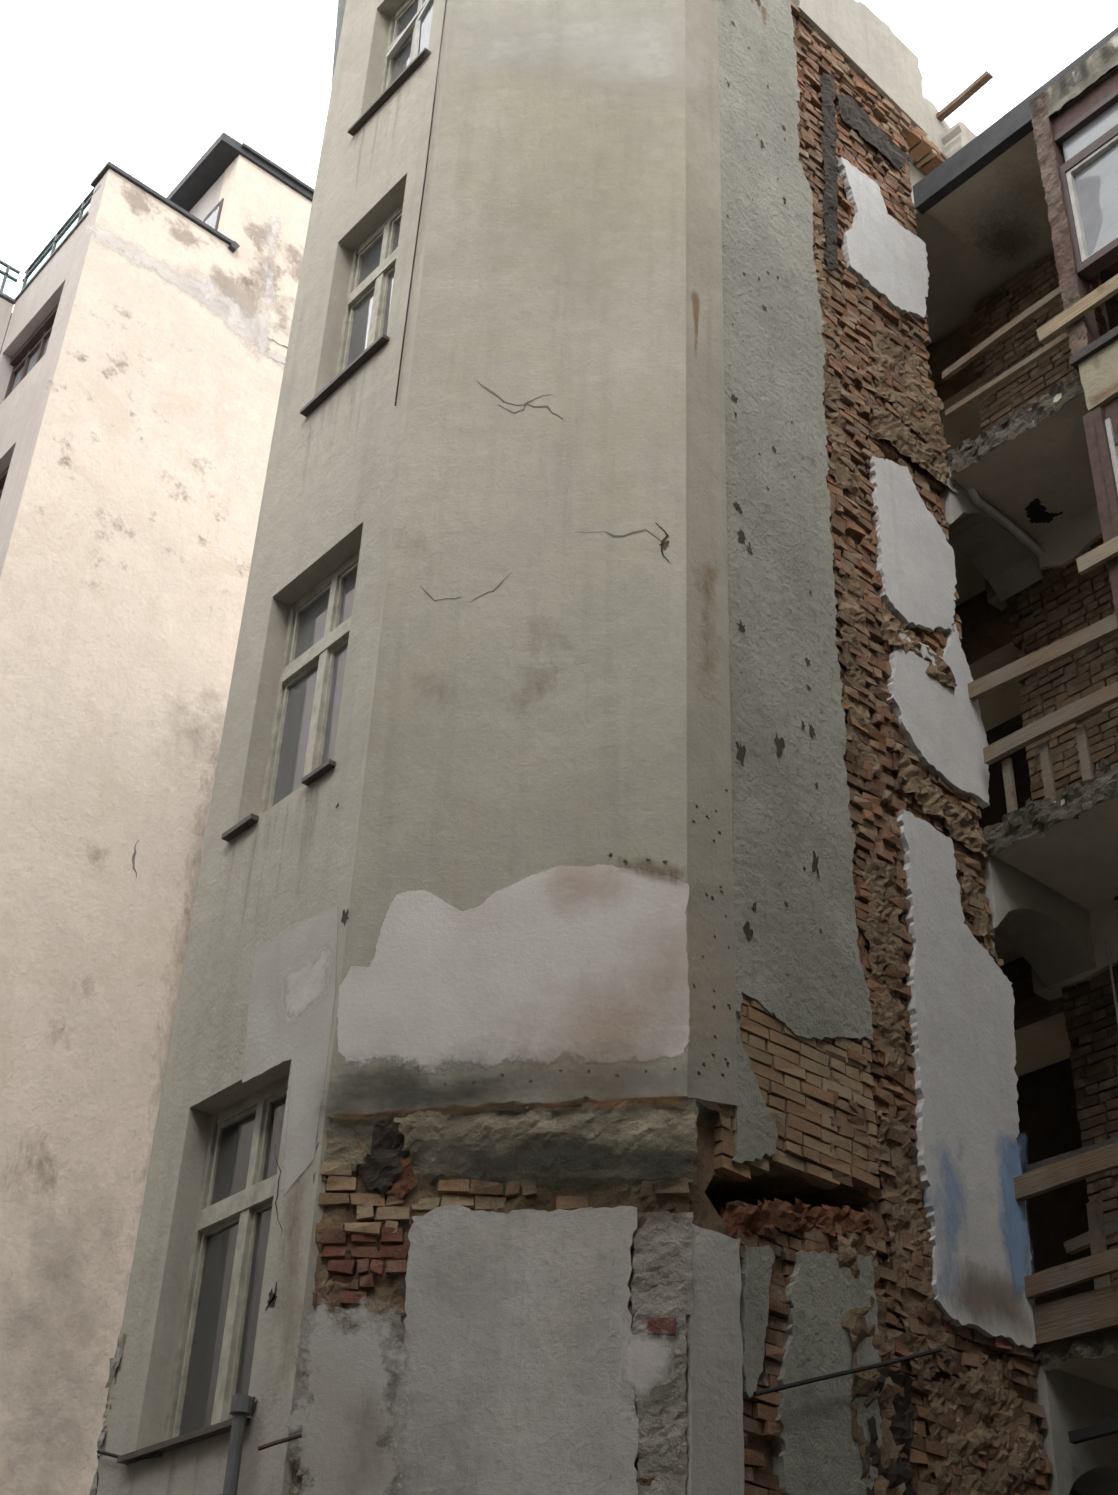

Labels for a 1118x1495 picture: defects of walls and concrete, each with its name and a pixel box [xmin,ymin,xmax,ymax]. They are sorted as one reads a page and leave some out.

crack [477,381,563,419]
spalling [1025,498,1063,524]
crack [575,523,671,564]
crack [420,572,512,602]
flaking render [287,0,1053,1495]